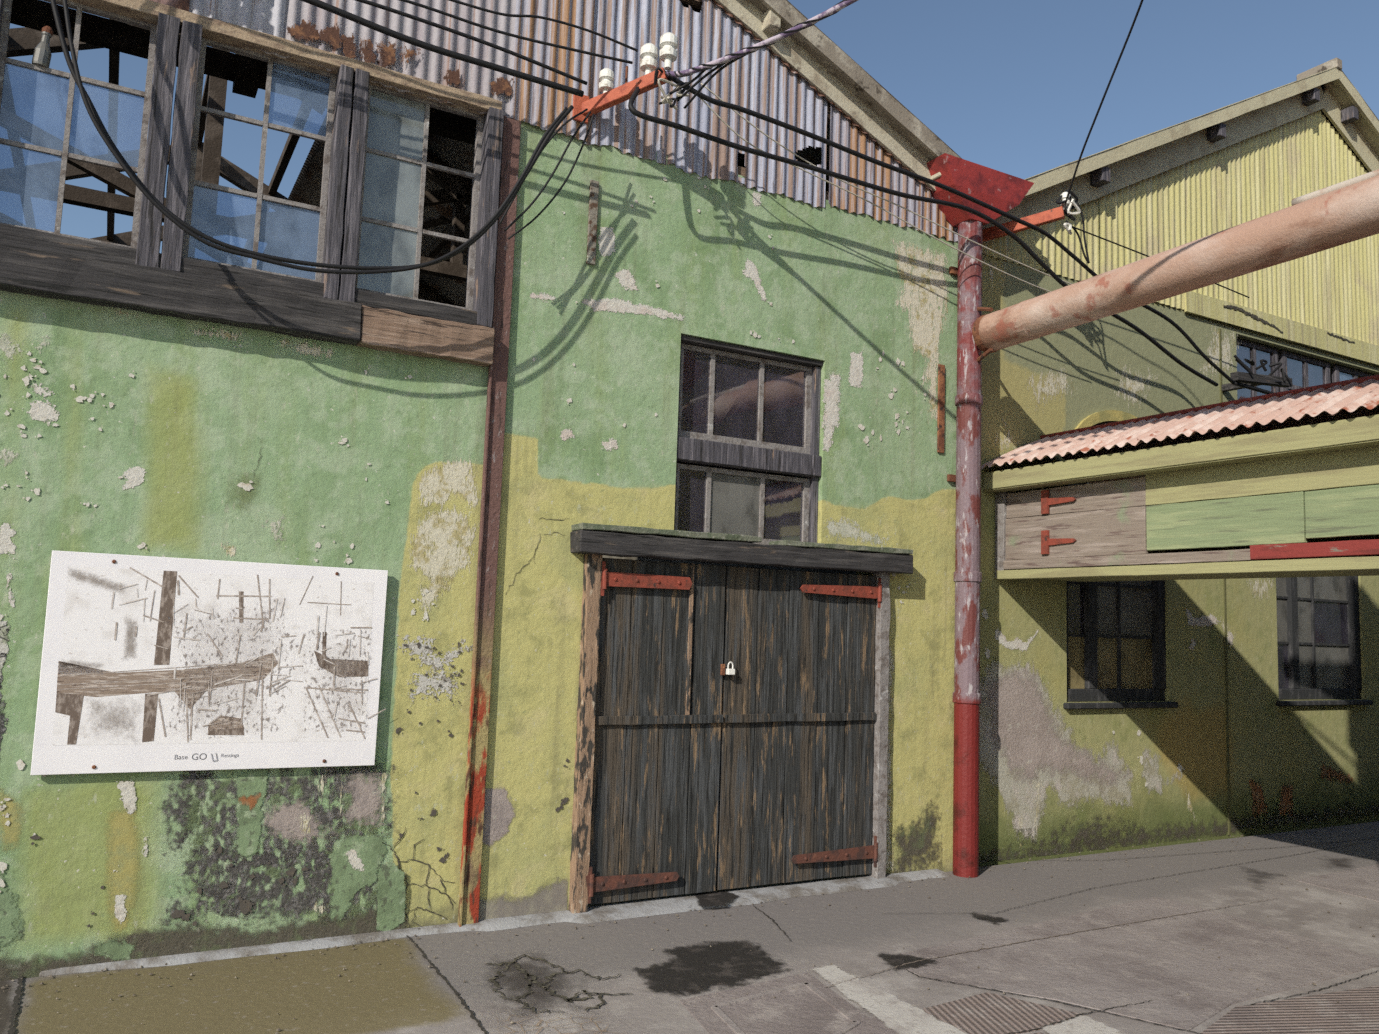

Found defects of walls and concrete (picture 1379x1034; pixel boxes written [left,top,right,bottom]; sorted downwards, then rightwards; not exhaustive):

rust [287,19,421,69]
rust [443,69,464,87]
rust [488,77,513,96]
peeling [598,226,618,257]
peeling [575,269,685,321]
peeling [820,238,950,452]
peeling [396,457,479,737]
leakage [0,621,10,750]
peeling [979,609,1185,848]
leakage [0,862,24,951]
leakage [162,760,395,925]
crack [383,827,455,926]